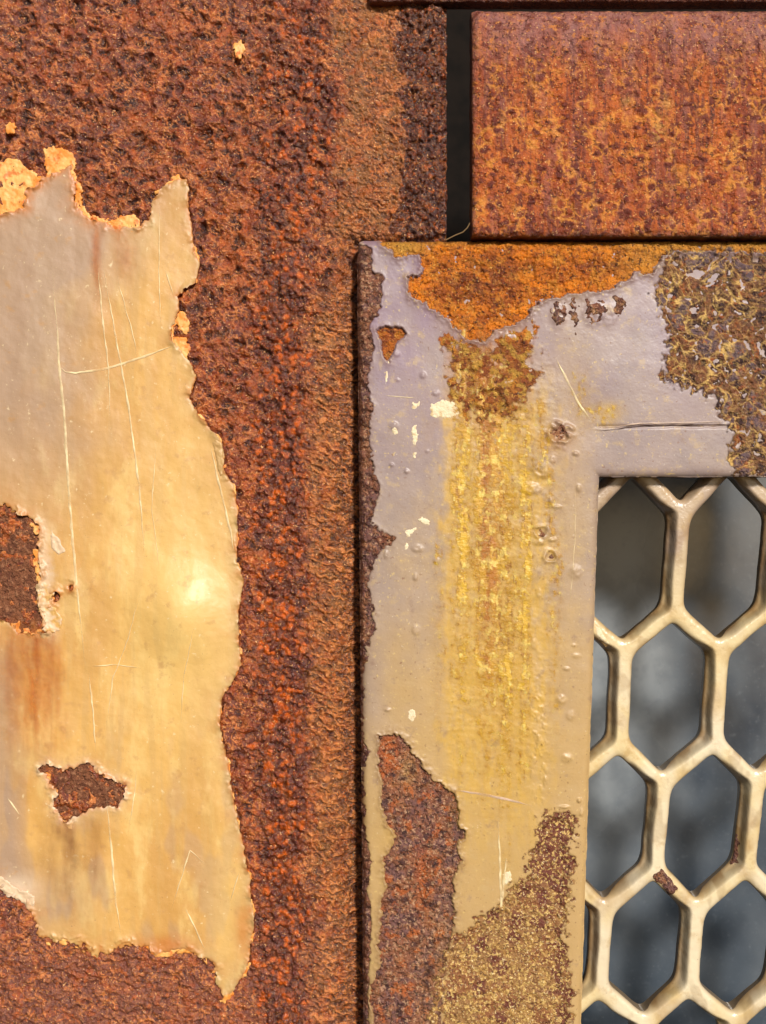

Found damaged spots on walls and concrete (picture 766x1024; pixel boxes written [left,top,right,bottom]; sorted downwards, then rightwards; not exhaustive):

peeling [233,40,246,61]
peeling [5,122,17,136]
crack [558,363,726,431]
corrosion [0,505,46,651]
peeling [0,146,256,1004]
corrosion [357,241,766,1024]
corrosion [40,762,127,819]